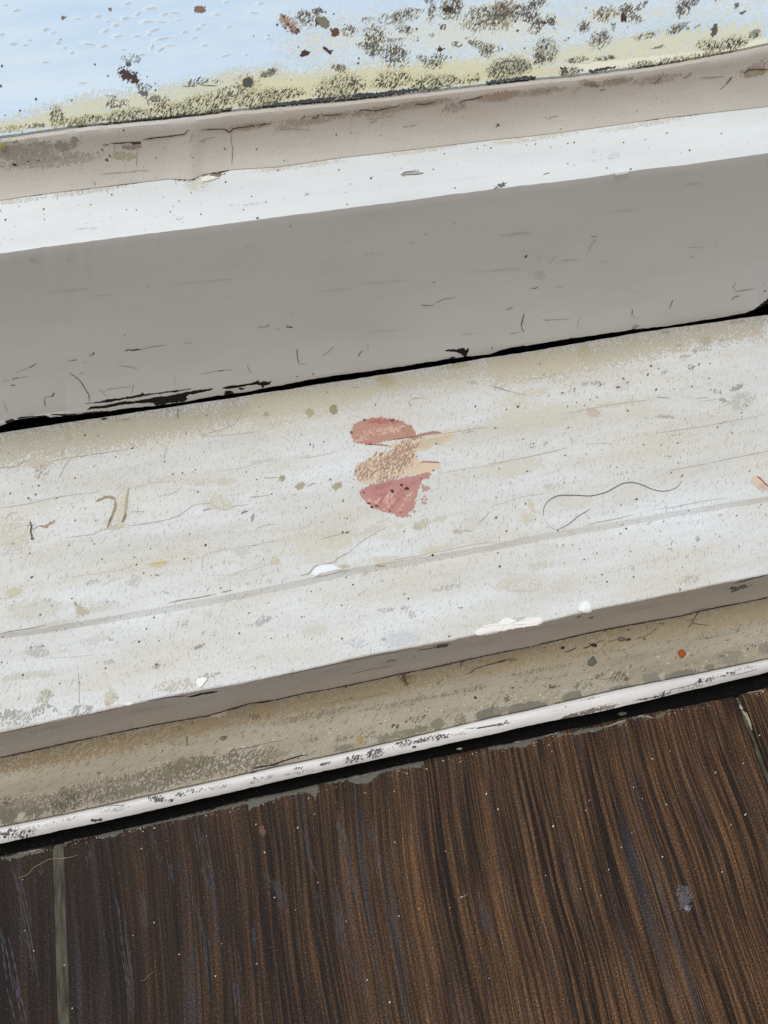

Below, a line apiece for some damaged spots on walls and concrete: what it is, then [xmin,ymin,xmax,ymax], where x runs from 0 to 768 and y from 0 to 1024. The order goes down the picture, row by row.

damp [0,0,768,173]
crack [94,102,434,193]
peeling [5,380,272,423]
peeling [352,416,455,518]
spalling [0,716,509,860]